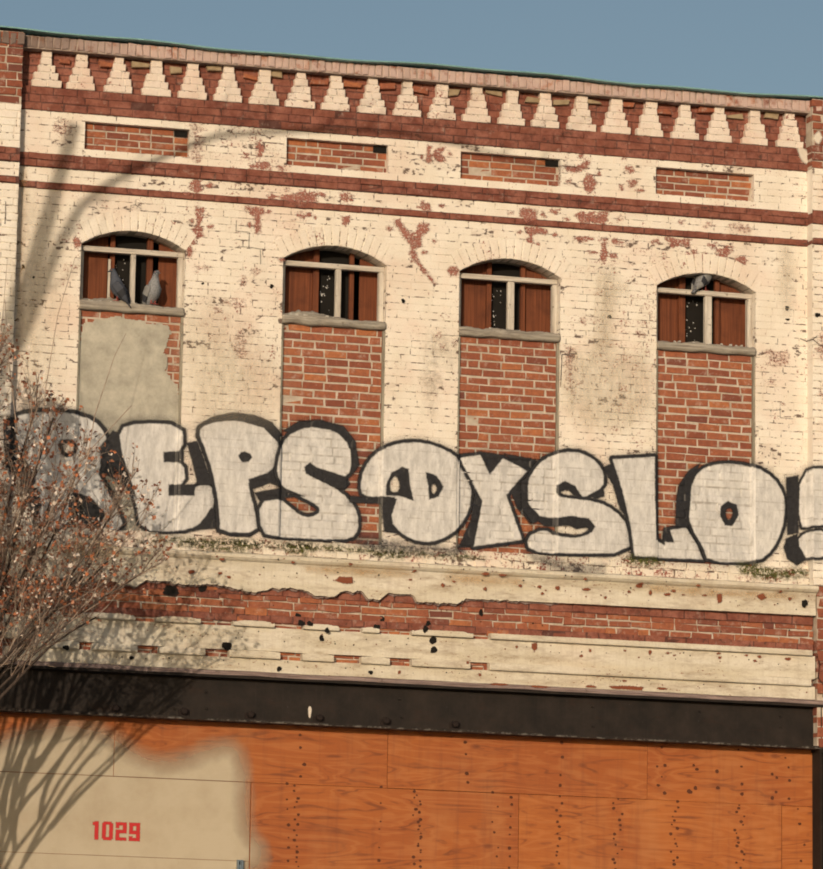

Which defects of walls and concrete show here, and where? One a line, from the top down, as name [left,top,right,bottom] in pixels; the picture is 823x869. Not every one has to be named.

peeling [182,179,213,197]
peeling [240,139,284,171]
peeling [545,153,601,193]
peeling [620,155,645,192]
peeling [187,206,214,257]
peeling [245,187,326,234]
peeling [387,219,436,284]
peeling [512,208,623,247]
peeling [651,236,747,265]